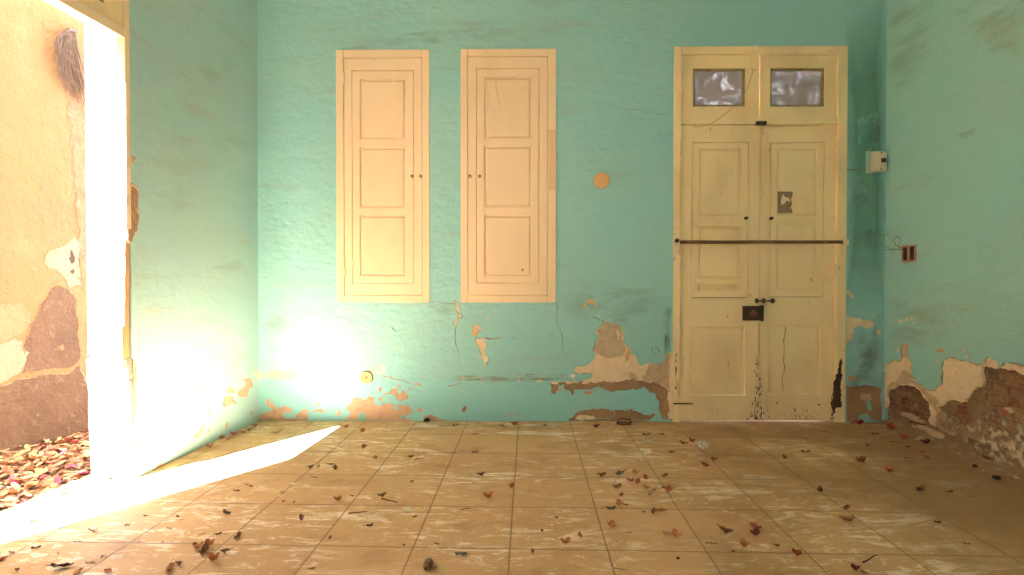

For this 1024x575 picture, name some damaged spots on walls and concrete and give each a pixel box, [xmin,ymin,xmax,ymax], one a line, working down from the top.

spalling [45,96,86,288]
spalling [126,183,139,243]
peeling [0,302,31,384]
spalling [193,369,301,438]
peeling [251,364,446,421]
peeling [453,300,489,381]
spalling [536,299,677,421]
spalling [846,314,881,346]
flaking render [883,343,1024,468]